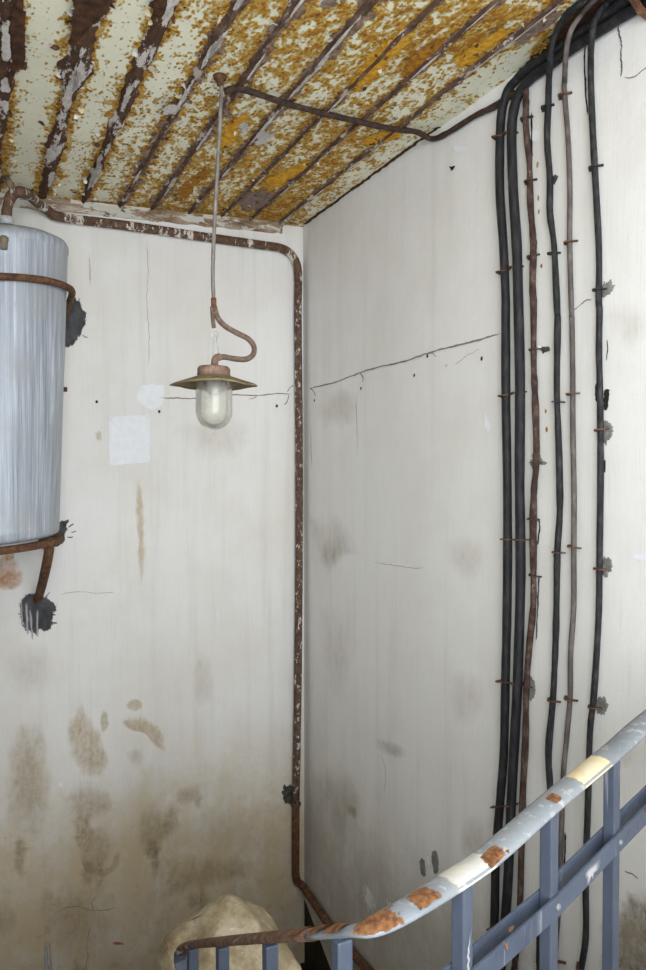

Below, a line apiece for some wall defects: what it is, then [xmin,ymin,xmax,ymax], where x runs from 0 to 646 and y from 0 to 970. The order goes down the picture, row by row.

peeling [141,0,153,25]
peeling [0,20,30,101]
peeling [162,83,200,115]
peeling [234,122,275,148]
corrosion [0,0,616,226]
crack [167,334,498,405]